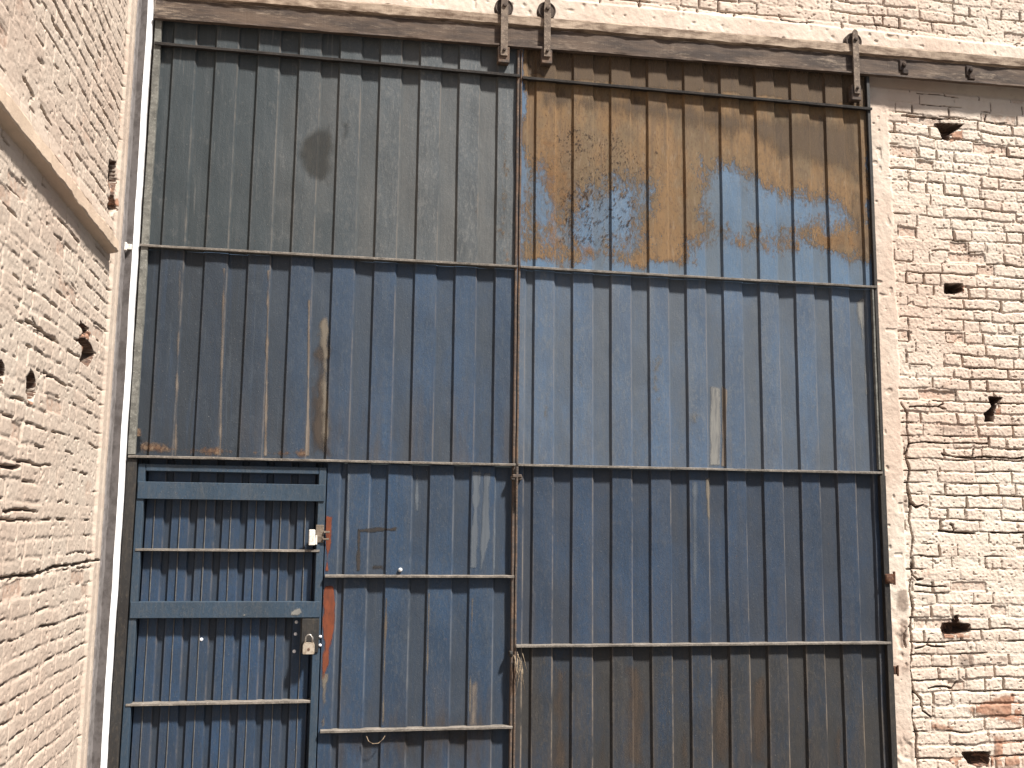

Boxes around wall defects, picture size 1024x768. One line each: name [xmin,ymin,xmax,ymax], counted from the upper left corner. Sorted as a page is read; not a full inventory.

hole [934,123,964,142]
hole [107,161,119,211]
hole [944,283,966,295]
hole [76,321,94,367]
hole [25,369,36,405]
hole [984,396,1002,422]
hole [941,615,971,638]
corrosion [322,586,335,702]
peeling [970,694,1023,726]
spalling [949,737,1023,767]